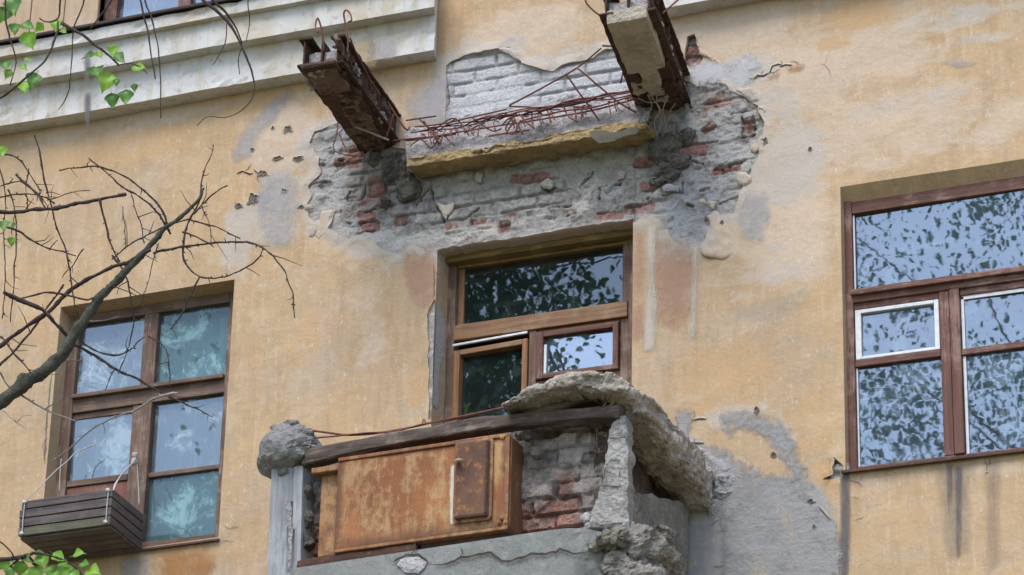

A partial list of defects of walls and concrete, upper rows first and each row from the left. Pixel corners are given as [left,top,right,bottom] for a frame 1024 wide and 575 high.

crack [750,59,831,79]
spalling [258,9,768,254]
spalling [234,192,260,209]
peeling [701,406,850,575]
water stain [947,467,961,526]
crack [393,531,613,565]
spalling [586,521,685,575]